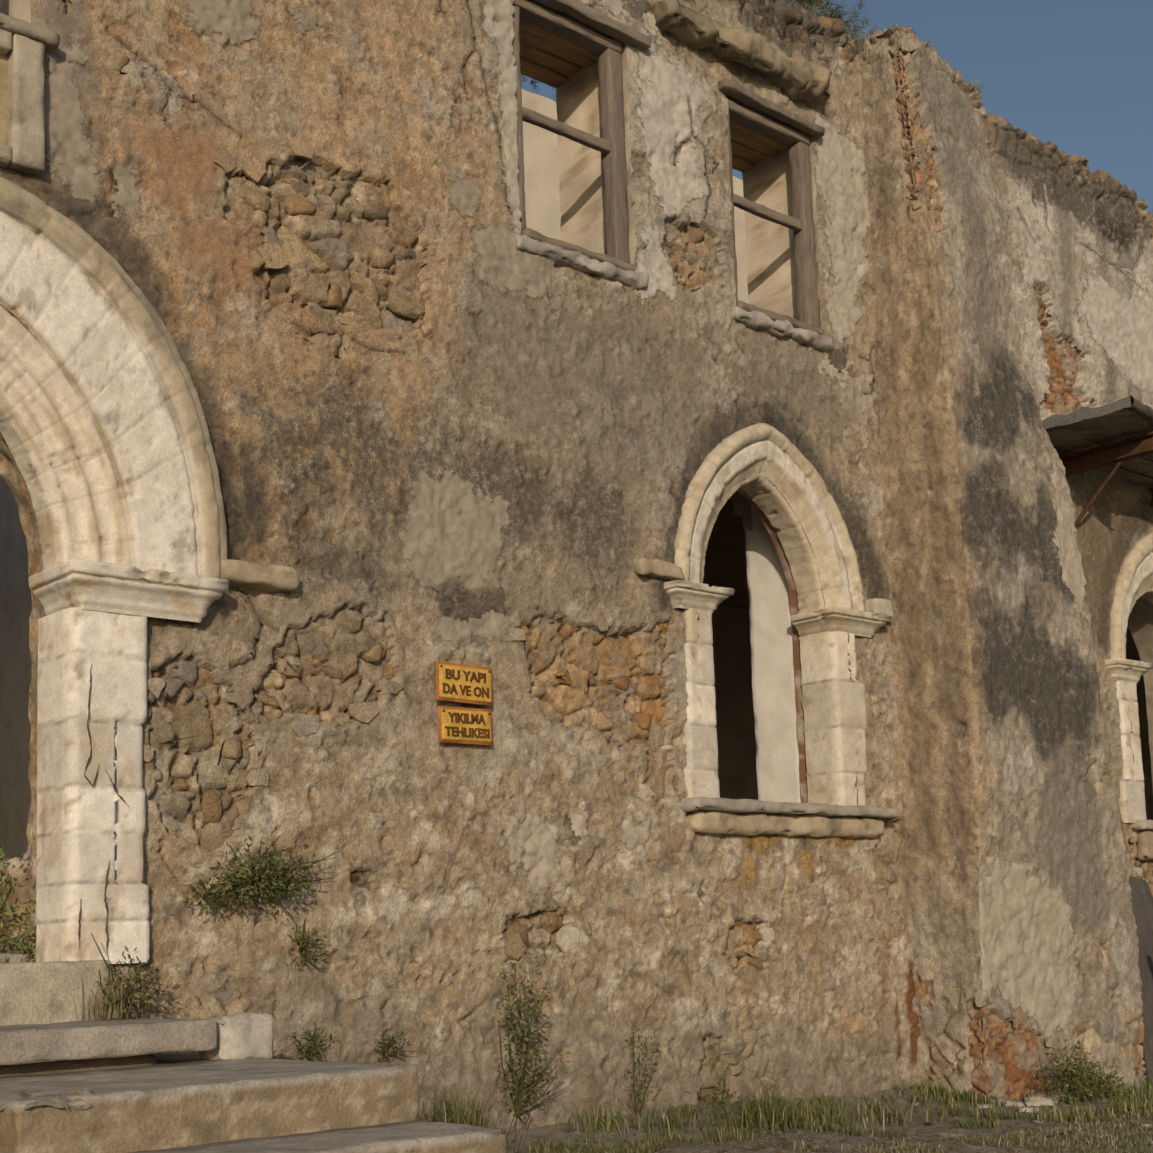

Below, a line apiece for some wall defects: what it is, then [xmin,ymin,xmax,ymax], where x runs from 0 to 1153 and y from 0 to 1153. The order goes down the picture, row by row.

spalling [213,134,427,339]
crack [436,0,515,213]
flaking render [470,0,561,299]
flaking render [582,0,722,305]
damp [918,66,1153,650]
crack [84,665,127,804]
spalling [143,604,403,851]
spalling [396,459,682,855]
damp [967,589,1109,927]
flaking render [1050,470,1092,630]
crack [78,863,110,955]
flaking render [967,856,1076,1101]